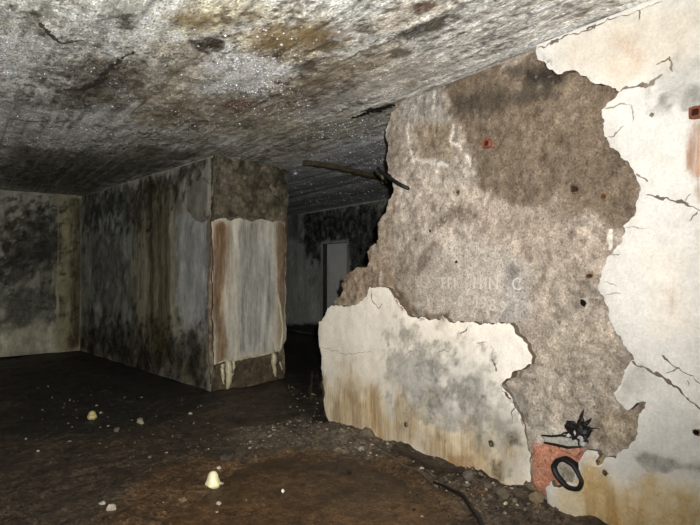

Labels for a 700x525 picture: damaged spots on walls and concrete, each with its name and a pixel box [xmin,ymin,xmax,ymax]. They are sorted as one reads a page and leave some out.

leakage [527,68,561,95]
crack [636,173,700,221]
leakage [0,159,207,388]
spalling [330,49,646,501]
spalling [214,352,285,387]
crack [632,355,700,409]